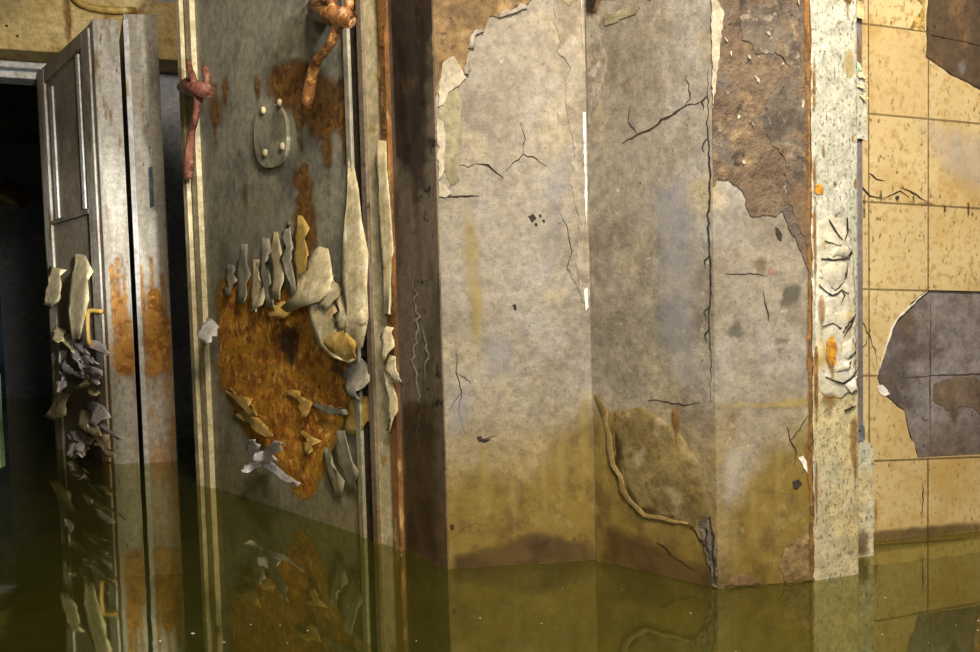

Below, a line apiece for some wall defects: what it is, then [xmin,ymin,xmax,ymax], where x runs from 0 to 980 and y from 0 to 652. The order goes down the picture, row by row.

rust [110,257,173,375]
peeling [197,140,394,499]
rust [255,59,347,168]
water stain [391,0,433,198]
crack [440,192,478,200]
crack [463,122,546,178]
crack [622,73,769,406]
peeling [711,0,809,270]
rust [804,0,838,580]
peeling [877,290,980,458]
water stain [403,403,718,589]
water stain [737,444,812,586]